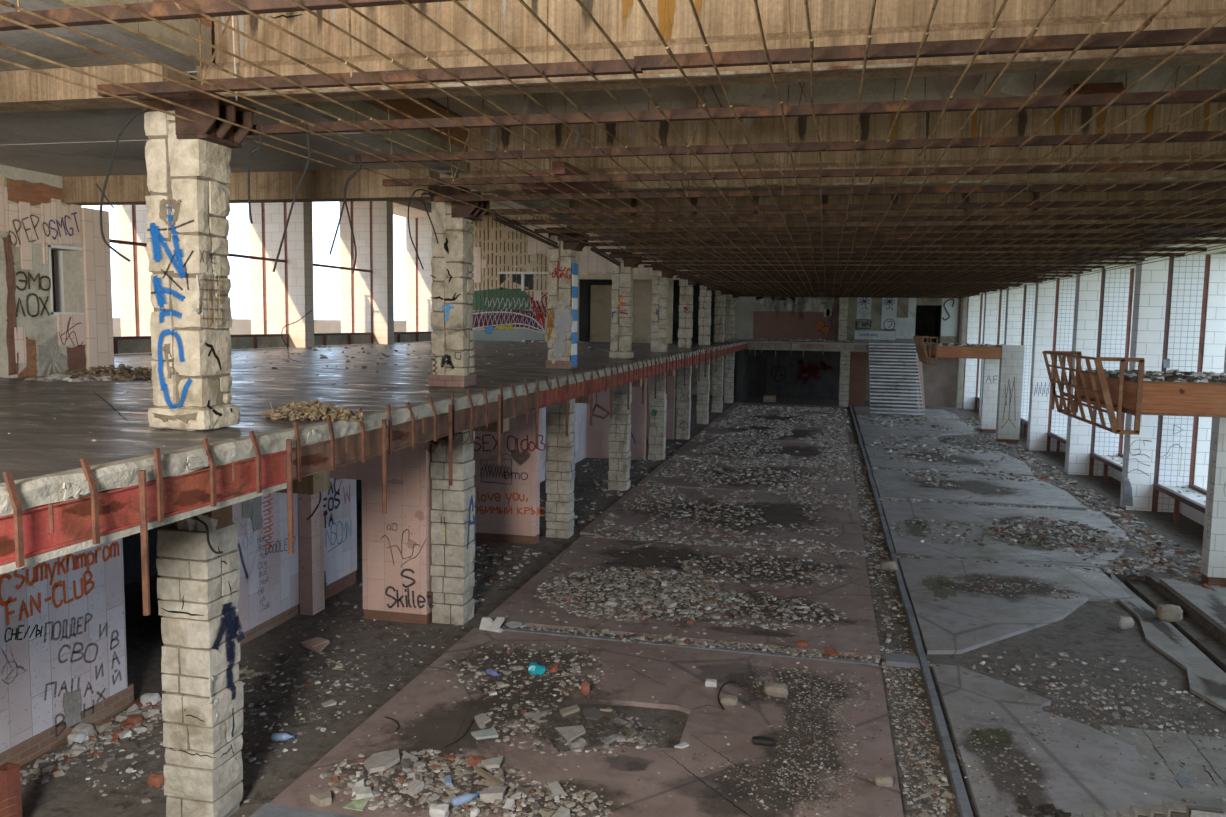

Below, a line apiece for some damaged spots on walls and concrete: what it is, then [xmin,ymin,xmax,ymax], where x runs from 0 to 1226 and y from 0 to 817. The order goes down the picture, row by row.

flaking render [0,174,71,206]
crack [201,341,221,370]
crack [207,400,232,416]
rust [425,436,447,453]
rust [68,499,124,516]
rust [175,489,221,506]
crack [162,595,204,616]
crack [167,709,237,760]